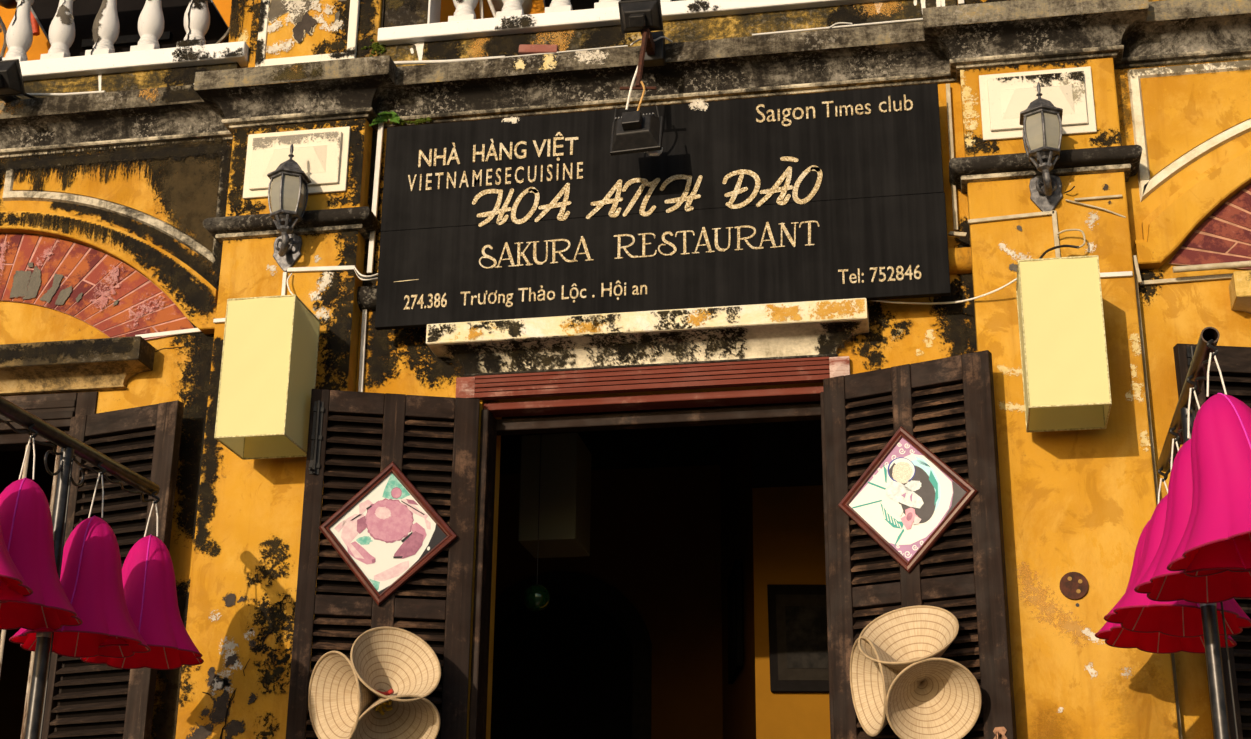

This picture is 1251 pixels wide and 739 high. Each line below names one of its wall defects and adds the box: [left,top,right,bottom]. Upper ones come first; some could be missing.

peeling [266,0,347,55]
damp [954,217,971,248]
flaking render [0,241,167,327]
damp [0,119,748,557]
damp [815,301,913,370]
damp [928,273,977,357]
spalling [208,592,249,622]
damp [246,535,296,694]
spalling [186,629,257,739]